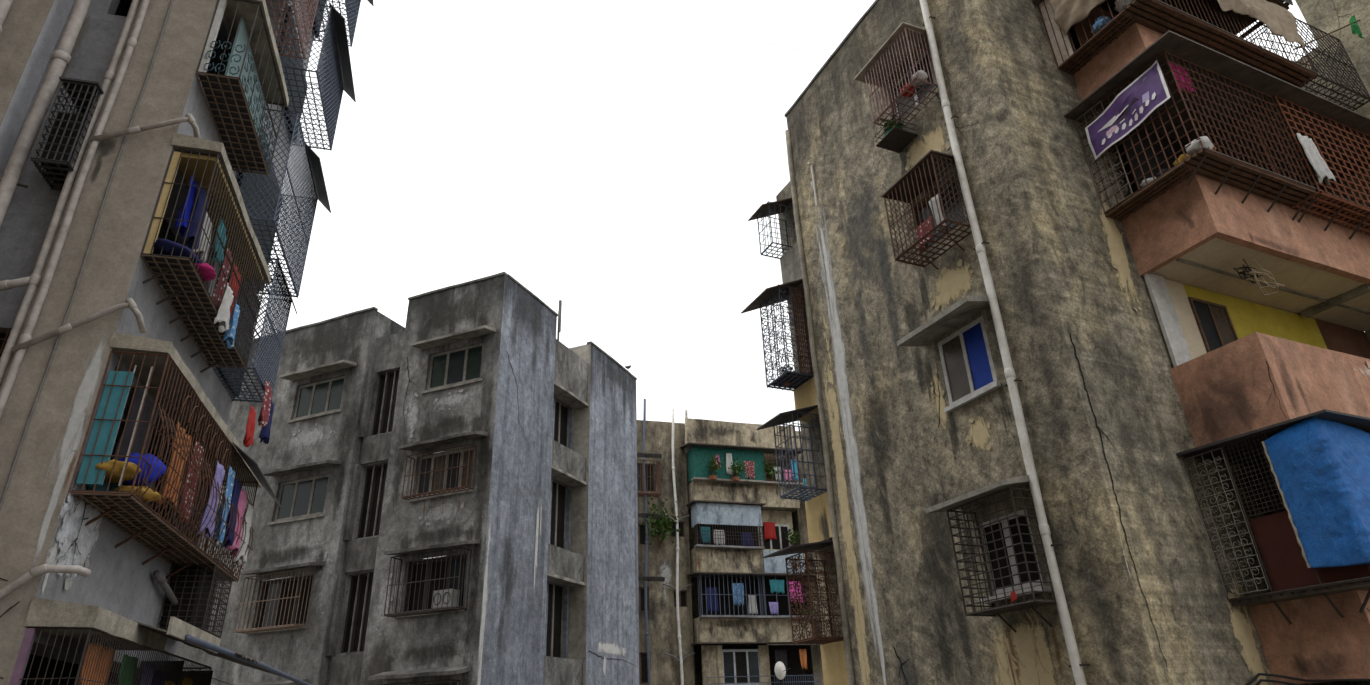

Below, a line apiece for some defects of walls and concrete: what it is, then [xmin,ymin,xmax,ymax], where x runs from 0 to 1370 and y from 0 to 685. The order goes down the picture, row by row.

leakage [915,354,934,397]
leakage [949,414,959,453]
leakage [393,382,513,685]
leakage [534,506,542,587]
leakage [922,512,976,674]
leakage [369,645,457,685]
leakage [598,642,626,676]
leakage [991,608,1061,685]